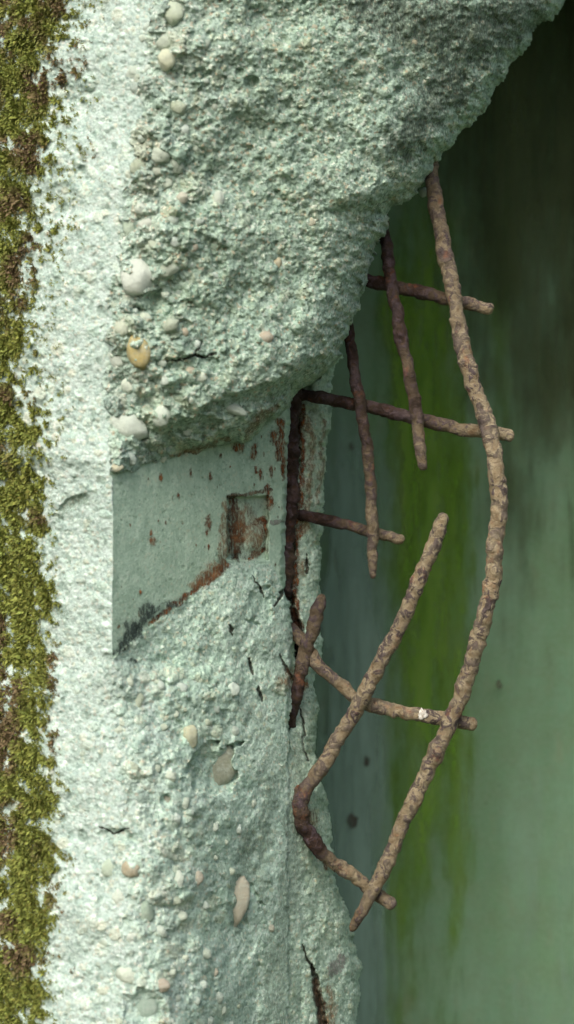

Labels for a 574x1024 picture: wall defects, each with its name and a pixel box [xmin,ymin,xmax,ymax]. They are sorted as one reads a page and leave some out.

leakage [331,0,574,438]
rust [138,404,326,631]
spalling [101,0,564,932]
leakage [321,443,382,734]
leakage [381,291,425,595]
leakage [436,363,473,699]
crack [302,944,327,1024]
leakage [324,710,406,1024]